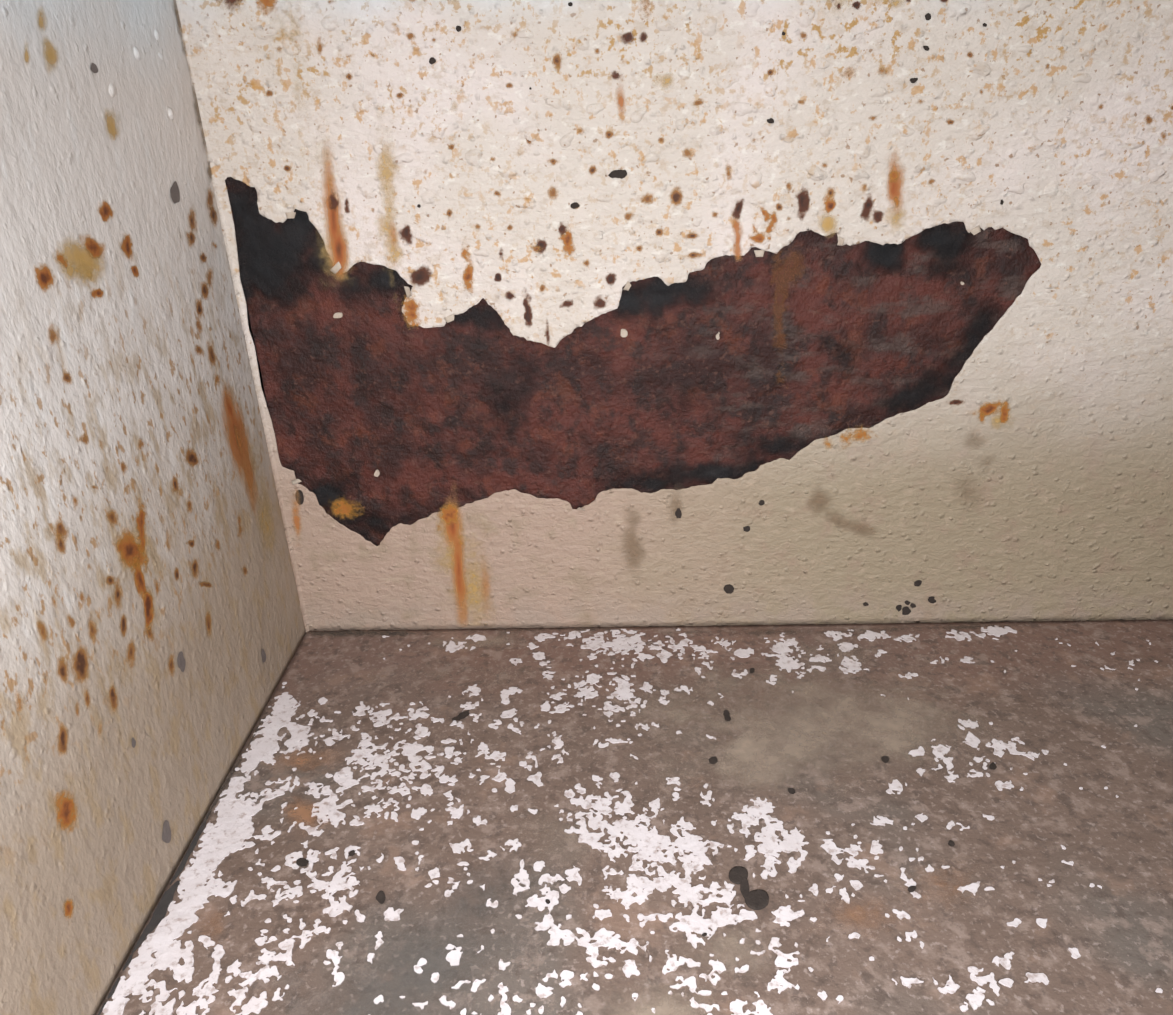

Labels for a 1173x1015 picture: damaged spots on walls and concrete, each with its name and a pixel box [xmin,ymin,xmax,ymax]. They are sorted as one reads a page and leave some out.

rust [325,170,350,275]
peeling [605,170,627,179]
rust [732,184,810,258]
rust [860,163,902,223]
rust [411,267,431,286]
rust [495,273,545,326]
peeling [225,177,1041,546]
rust [107,503,159,639]
water stain [718,683,936,782]
water stain [288,803,319,824]
water stain [344,944,466,1015]
water stain [637,999,690,1015]